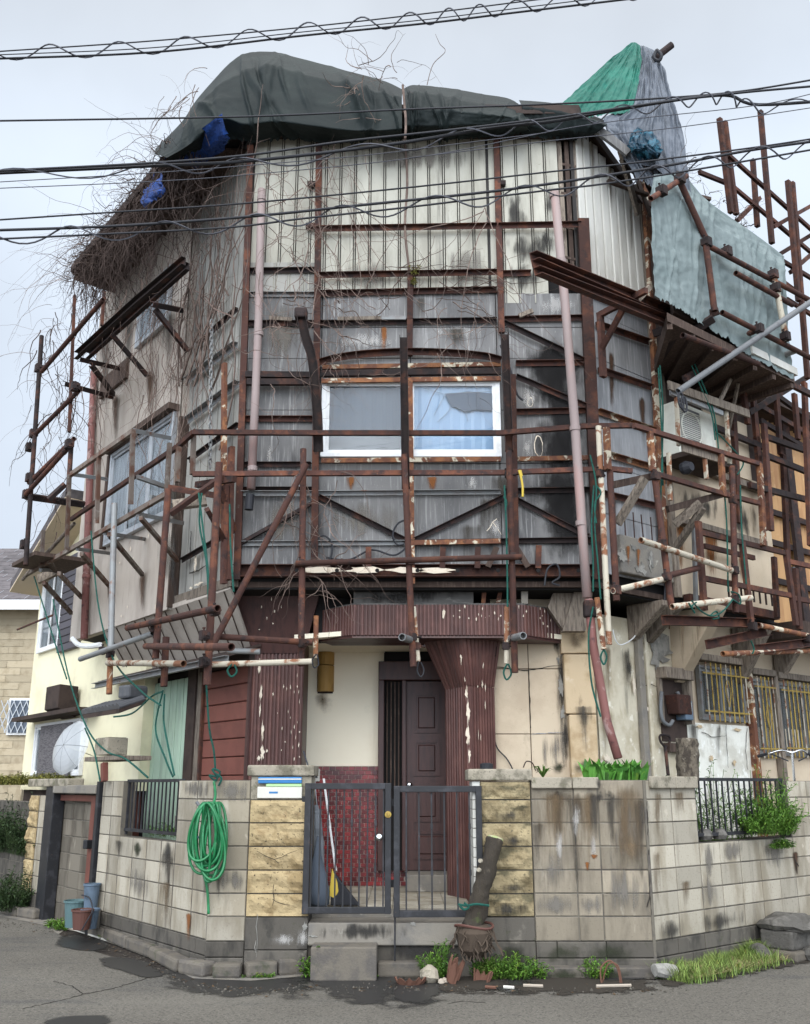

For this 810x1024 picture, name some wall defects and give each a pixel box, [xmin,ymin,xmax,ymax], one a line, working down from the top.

leakage [509,199,524,222]
leakage [514,233,552,287]
peeling [257,659,300,760]
peeling [464,677,486,762]
leakage [162,842,173,908]
leakage [535,791,644,877]
leakage [702,846,713,902]
leakage [726,843,739,859]